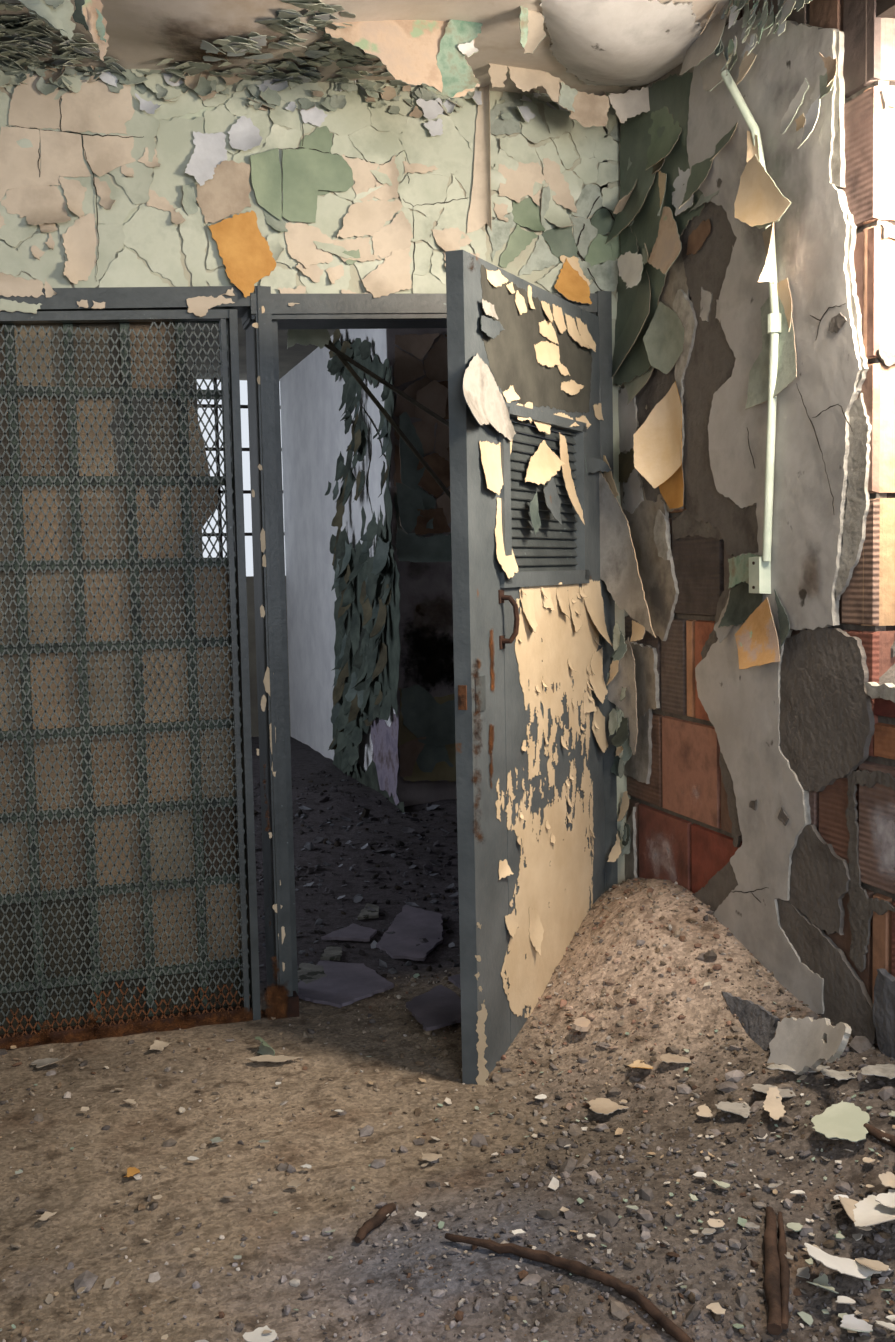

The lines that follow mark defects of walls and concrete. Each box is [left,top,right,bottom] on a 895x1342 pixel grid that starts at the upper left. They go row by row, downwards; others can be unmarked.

crack [6,96,142,281]
crack [286,122,469,290]
water stain [406,632,454,690]
rust [0,958,288,1049]
peeling [475,955,489,1086]
peeling [628,1053,691,1069]
peeling [767,1064,796,1072]
peeling [807,1064,895,1081]
peeling [585,1098,629,1115]
peeling [696,1087,786,1120]
peeling [875,1171,895,1208]
peeling [838,1196,872,1231]